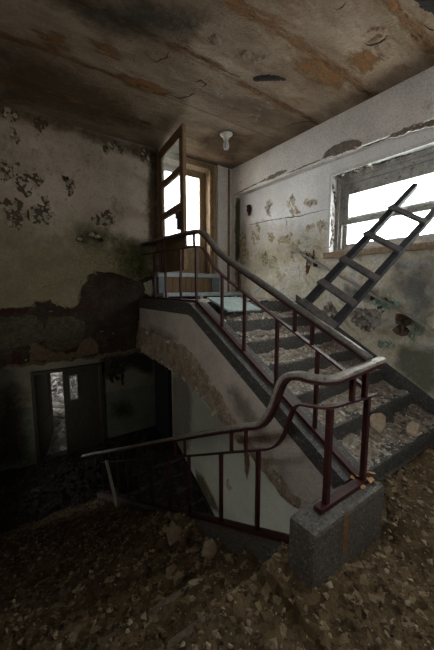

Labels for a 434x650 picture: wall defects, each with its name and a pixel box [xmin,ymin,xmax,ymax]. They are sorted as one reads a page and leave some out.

rust [224,0,382,97]
spalling [253,74,286,82]
spalling [387,119,434,138]
water stain [203,134,246,159]
spalling [322,139,363,159]
water stain [0,51,158,278]
peeling [0,159,56,231]
peeling [62,175,76,196]
peeling [286,194,317,217]
peeling [349,297,428,342]
spalling [0,270,301,509]